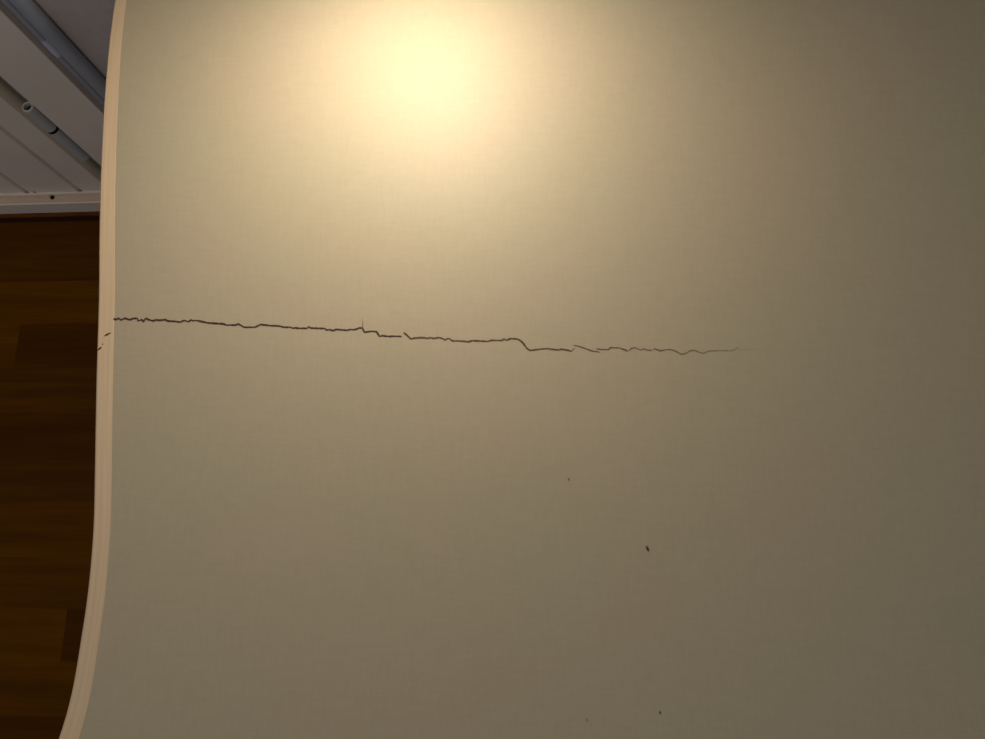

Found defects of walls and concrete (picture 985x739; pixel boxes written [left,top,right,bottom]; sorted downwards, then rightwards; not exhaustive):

crack [97,317,689,355]